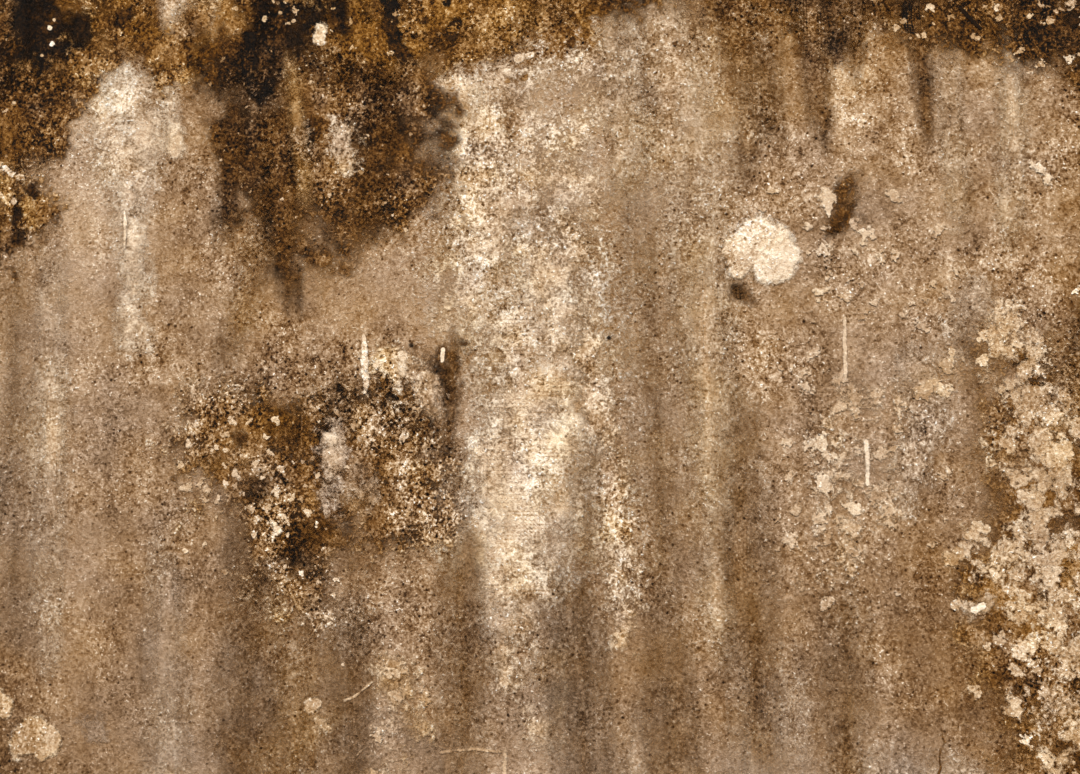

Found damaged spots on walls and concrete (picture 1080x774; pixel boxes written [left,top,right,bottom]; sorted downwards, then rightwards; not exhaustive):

peeling [145,370,507,637]
water stain [0,0,698,774]
water stain [689,265,774,774]
spalling [730,283,754,303]
water stain [823,168,866,241]
water stain [722,0,1080,218]
peeling [774,268,1080,774]
crack [925,729,946,774]